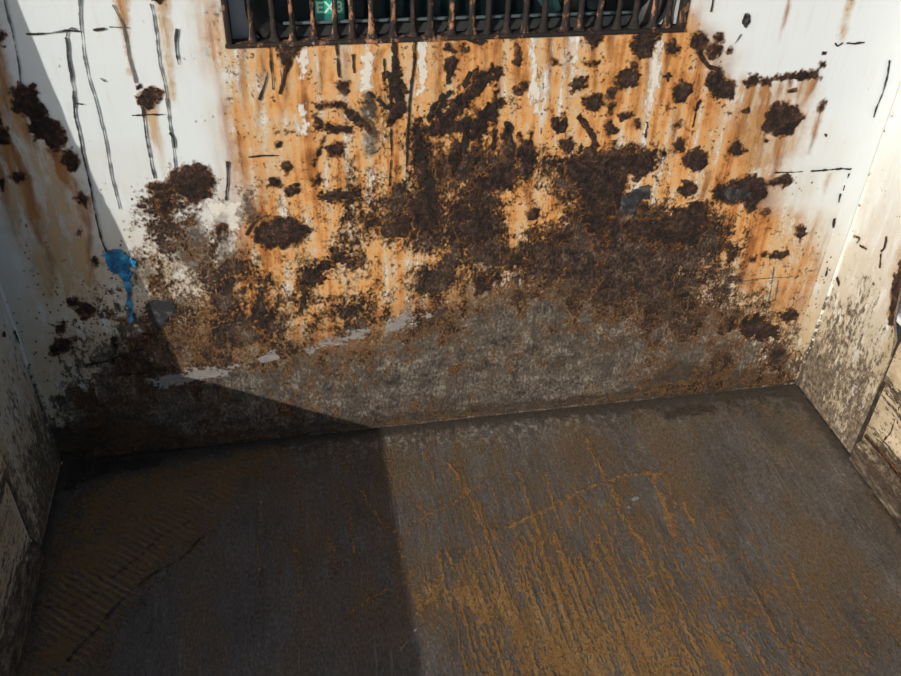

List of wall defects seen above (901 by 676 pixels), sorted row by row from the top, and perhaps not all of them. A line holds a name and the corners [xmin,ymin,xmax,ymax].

rust [116,0,127,29]
rust [0,53,93,292]
rust [206,9,827,344]
rust [256,413,901,676]